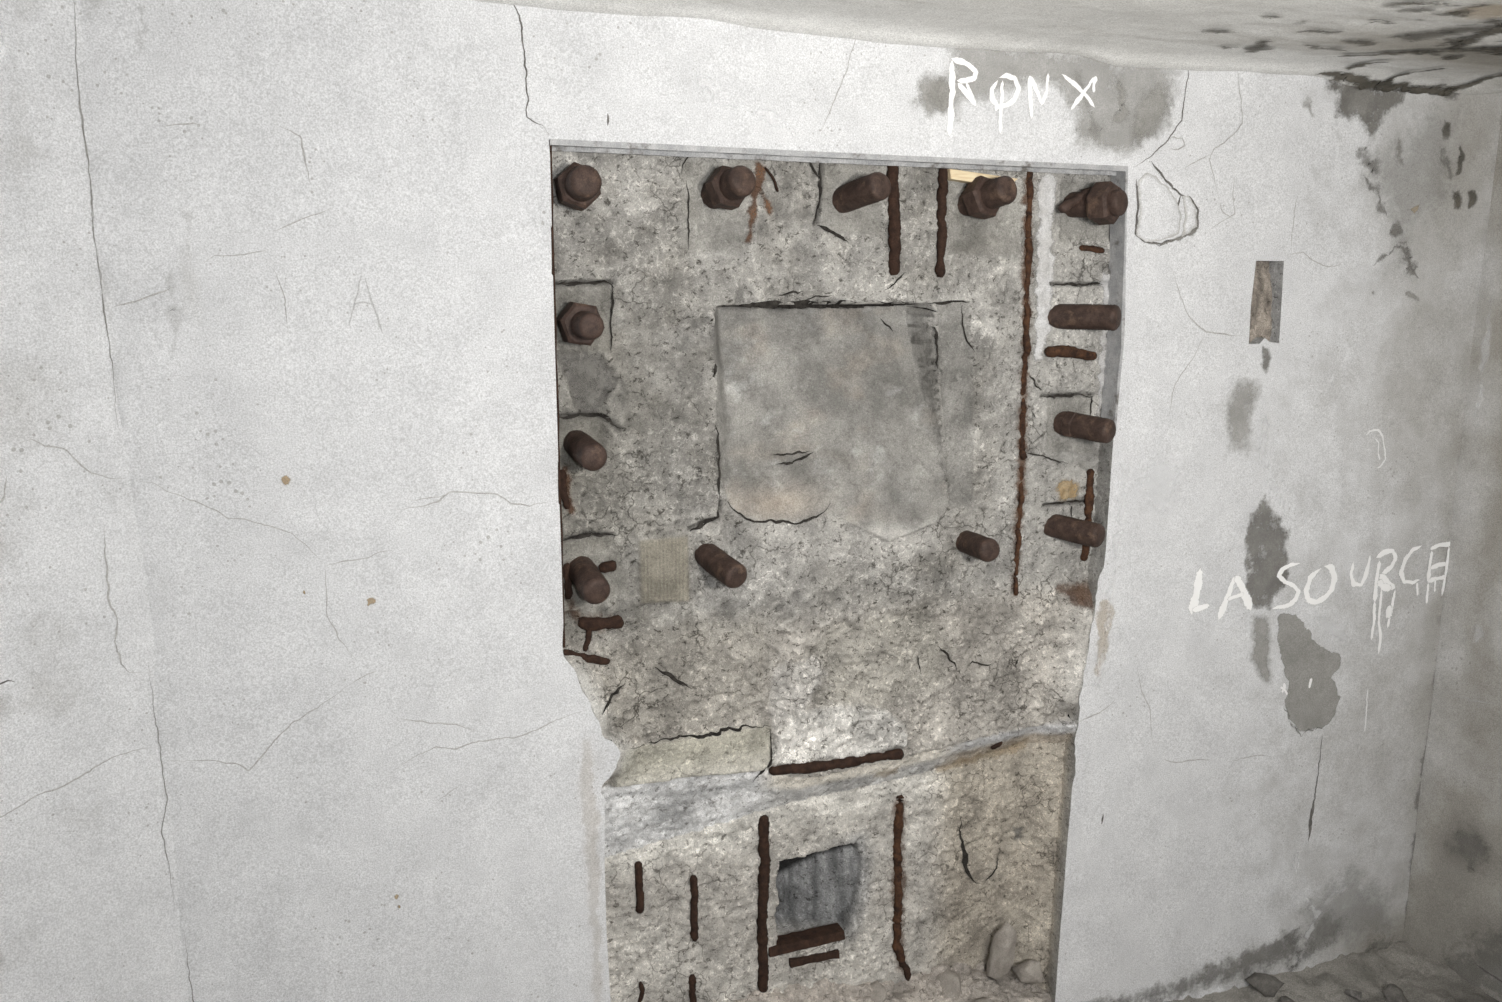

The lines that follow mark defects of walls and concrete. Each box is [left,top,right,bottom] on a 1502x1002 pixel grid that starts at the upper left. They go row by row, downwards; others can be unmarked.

crack [74,5,177,423]
crack [514,5,548,133]
corrosion [746,162,773,242]
water stain [920,48,1169,148]
water stain [1329,80,1405,134]
water stain [1441,123,1477,209]
corrosion [1011,179,1034,588]
peeling [583,630,592,652]
corrosion [1056,582,1093,608]
water stain [1245,501,1289,681]
crack [0,439,385,1002]
crack [396,667,692,802]